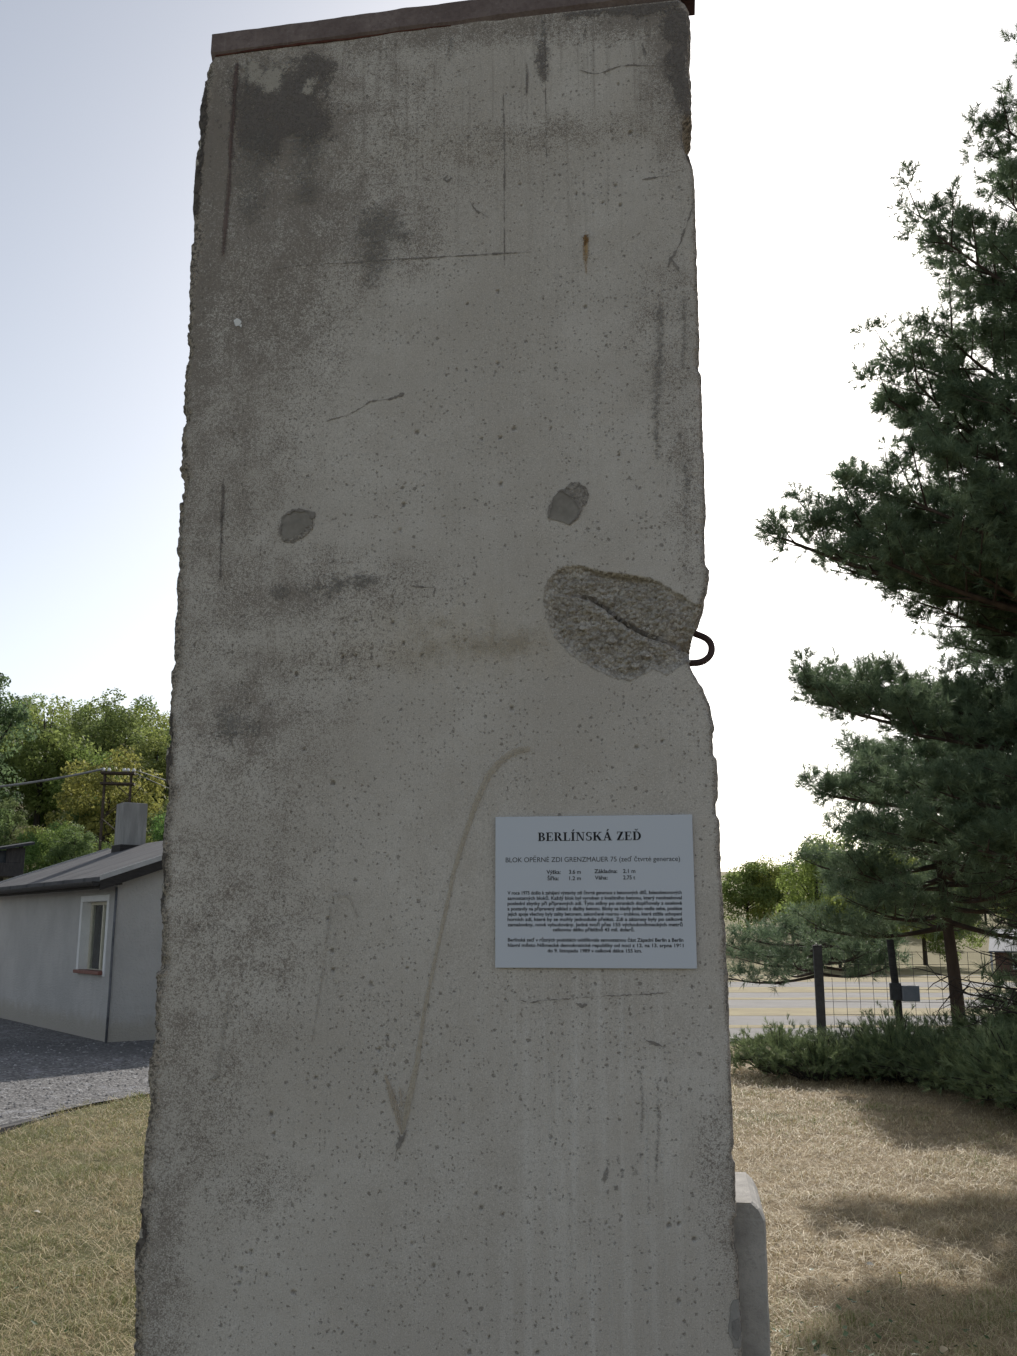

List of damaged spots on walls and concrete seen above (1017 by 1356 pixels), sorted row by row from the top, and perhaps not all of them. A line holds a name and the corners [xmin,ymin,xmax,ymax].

leakage [218,47,339,223]
spalling [565,482,589,507]
spalling [543,565,703,681]